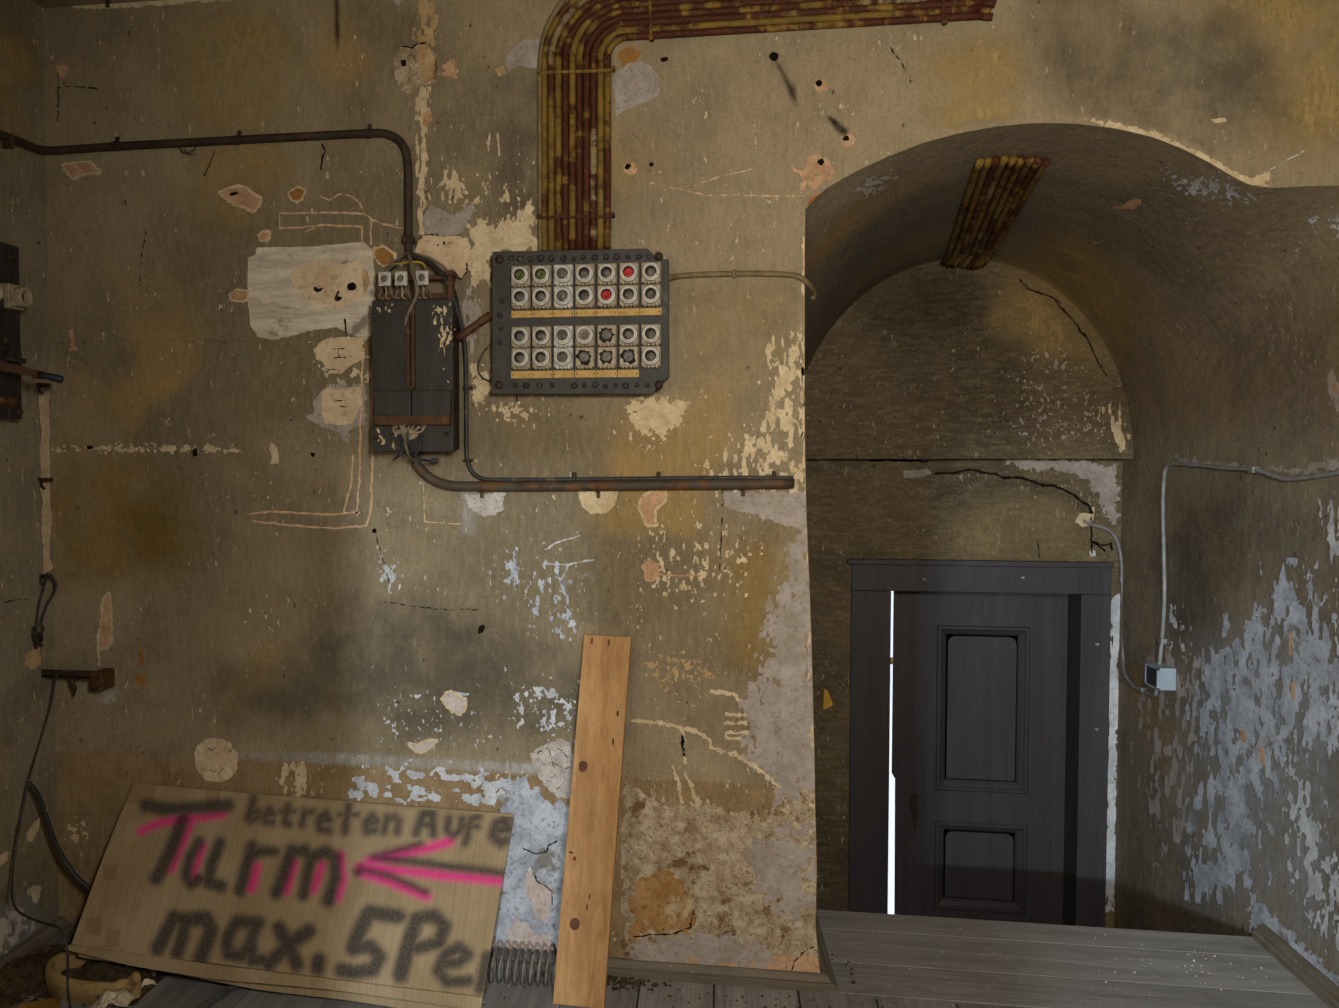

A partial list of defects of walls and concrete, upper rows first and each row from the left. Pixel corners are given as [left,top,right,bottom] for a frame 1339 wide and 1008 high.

spalling [393,0,550,429]
spalling [630,490,763,622]
peeling [694,325,806,507]
crack [868,459,1113,553]
crack [1019,279,1107,376]
peeling [1167,454,1339,478]
spalling [1327,368,1339,412]
flaking render [620,522,820,969]
peeling [1130,498,1339,955]
spalling [505,867,556,954]